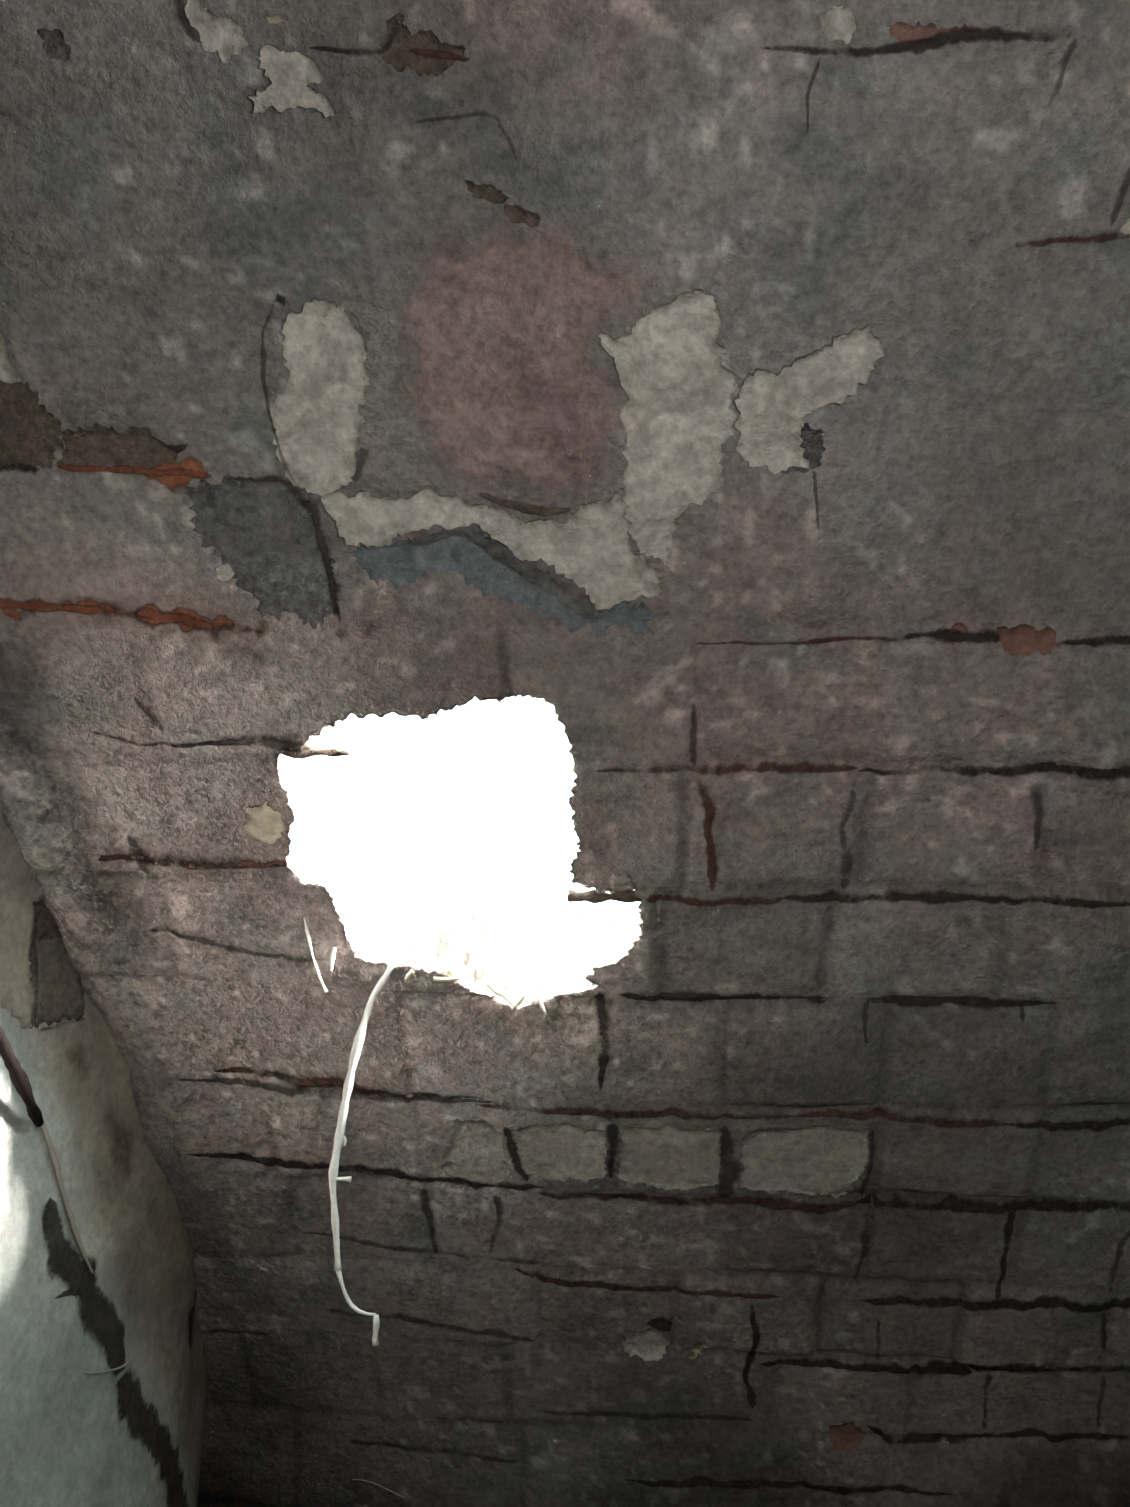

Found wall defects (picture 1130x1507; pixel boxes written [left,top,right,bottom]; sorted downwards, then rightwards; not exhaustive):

peeling [177,0,470,117]
spalling [0,333,187,475]
corrosion [58,457,210,491]
damp [409,238,627,517]
peeling [183,288,884,636]
corrosion [0,598,266,636]